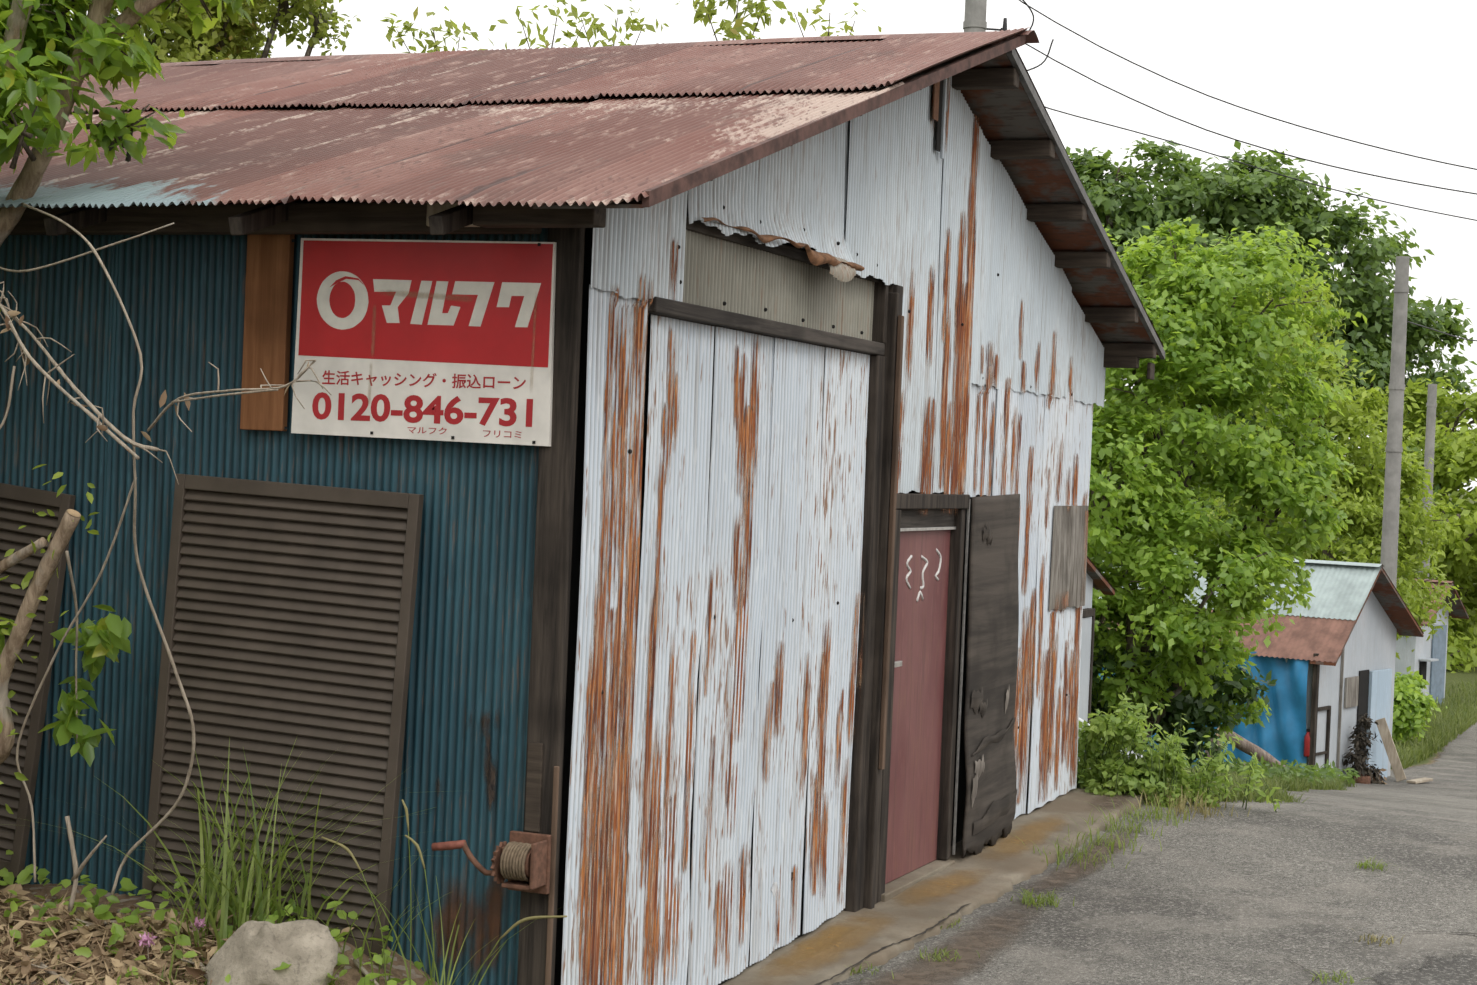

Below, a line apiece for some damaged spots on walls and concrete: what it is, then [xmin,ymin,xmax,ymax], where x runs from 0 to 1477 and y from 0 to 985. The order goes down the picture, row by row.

rust [931,78,951,143]
rust [577,276,760,985]
rust [762,644,785,781]
rust [776,596,862,943]
rust [897,115,1088,804]